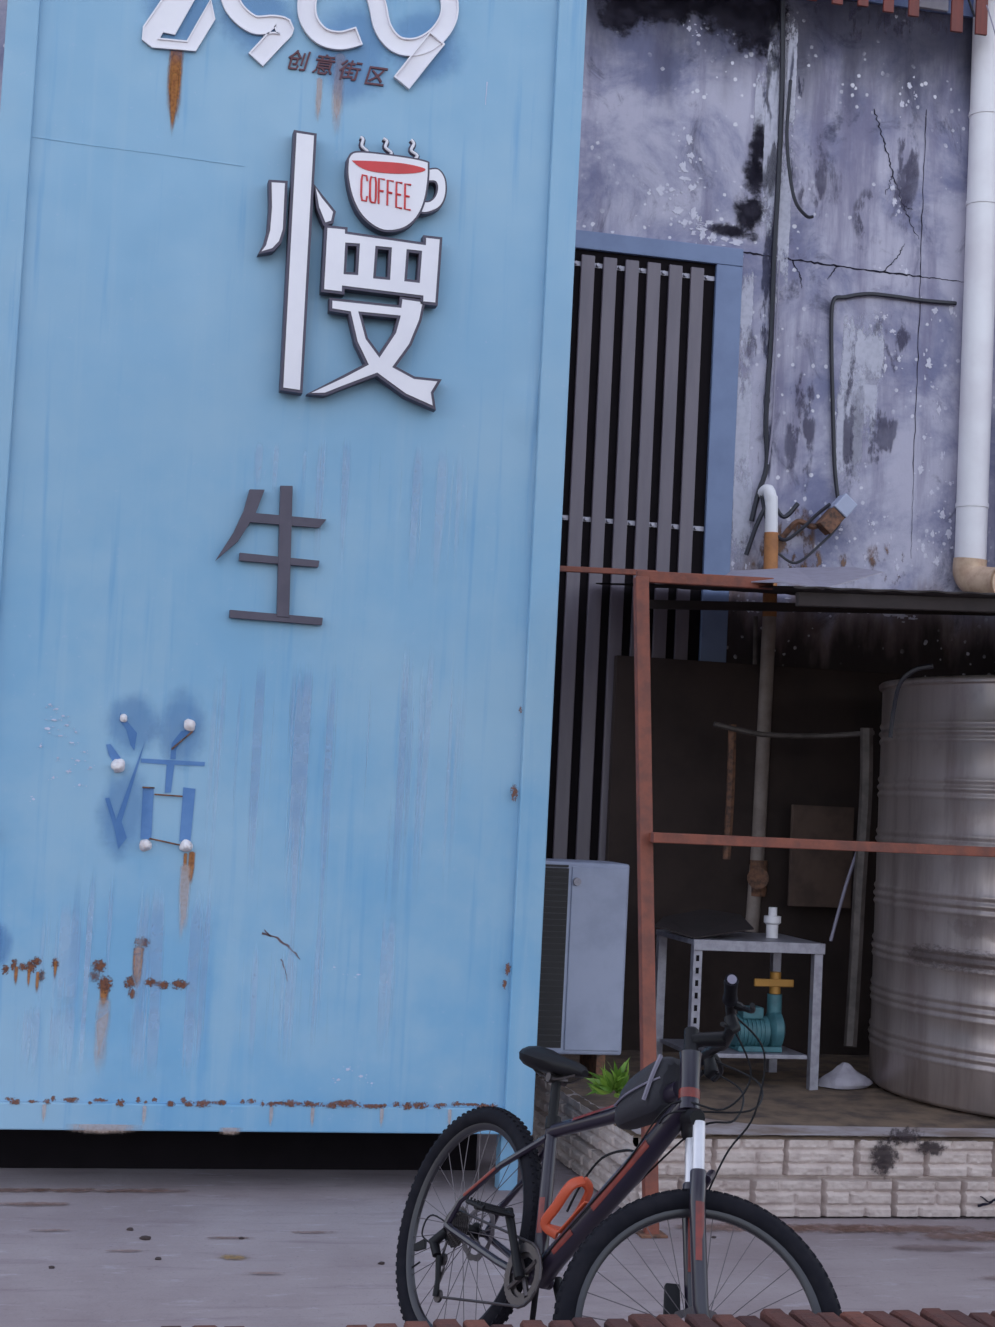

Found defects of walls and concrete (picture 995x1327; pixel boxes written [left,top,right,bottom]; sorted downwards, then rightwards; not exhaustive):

corrosion [168,50,183,126]
peeling [649,127,745,246]
water stain [895,141,918,208]
water stain [598,0,826,559]
crack [743,109,960,547]
water stain [836,316,908,478]
corrosion [184,852,195,881]
corrosion [1,958,59,990]
corrosion [90,936,189,1004]
corrosion [5,1096,498,1110]